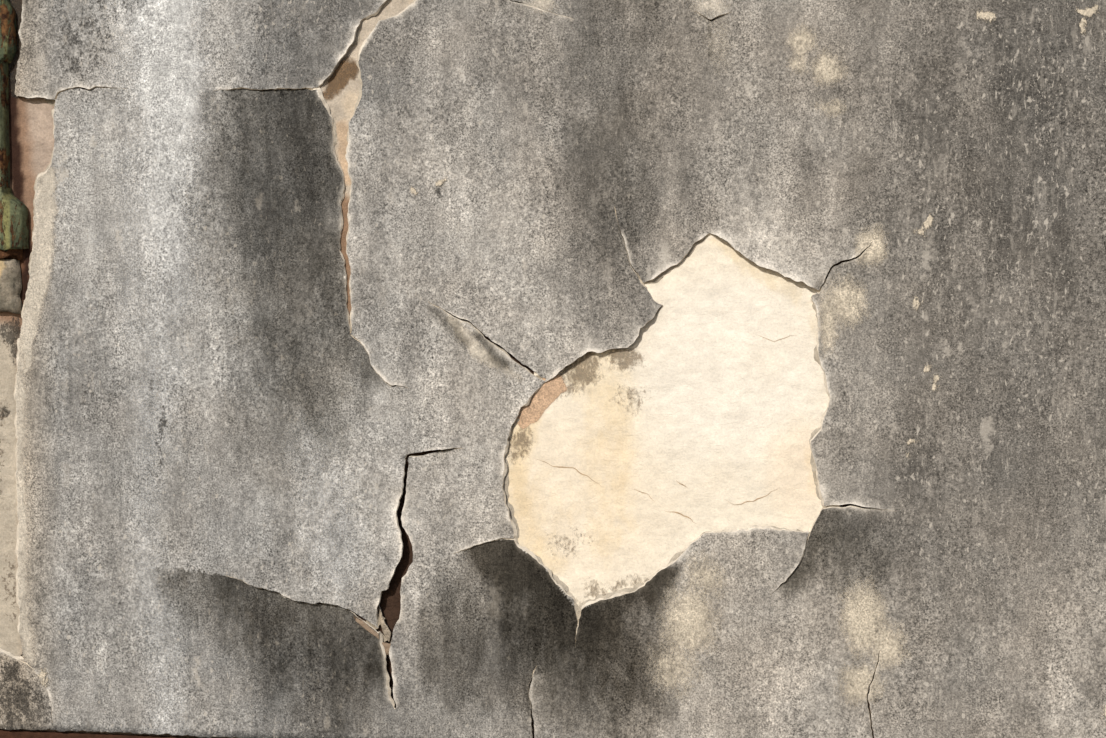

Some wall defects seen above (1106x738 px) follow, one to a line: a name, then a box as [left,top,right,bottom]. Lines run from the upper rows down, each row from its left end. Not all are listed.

spalling [976,10,996,23]
spalling [1076,4,1100,34]
peeling [307,0,455,339]
crack [427,297,543,382]
water stain [560,348,642,393]
water stain [512,430,529,458]
peeling [485,217,848,622]
crack [229,437,462,709]
crack [452,525,512,553]
water stain [470,539,720,703]